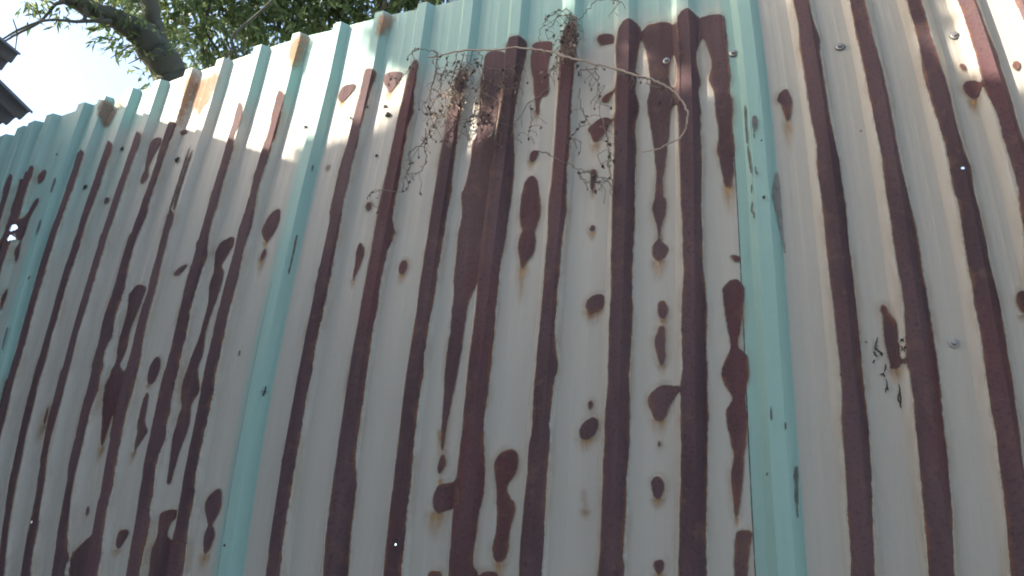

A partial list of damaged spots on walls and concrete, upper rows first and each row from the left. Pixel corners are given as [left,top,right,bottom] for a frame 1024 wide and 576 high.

rust [0,73,284,576]
rust [266,60,418,576]
rust [384,22,577,576]
rust [579,8,735,576]
rust [721,279,752,576]
rust [793,0,876,576]
rust [850,0,955,576]
rust [907,0,1024,576]